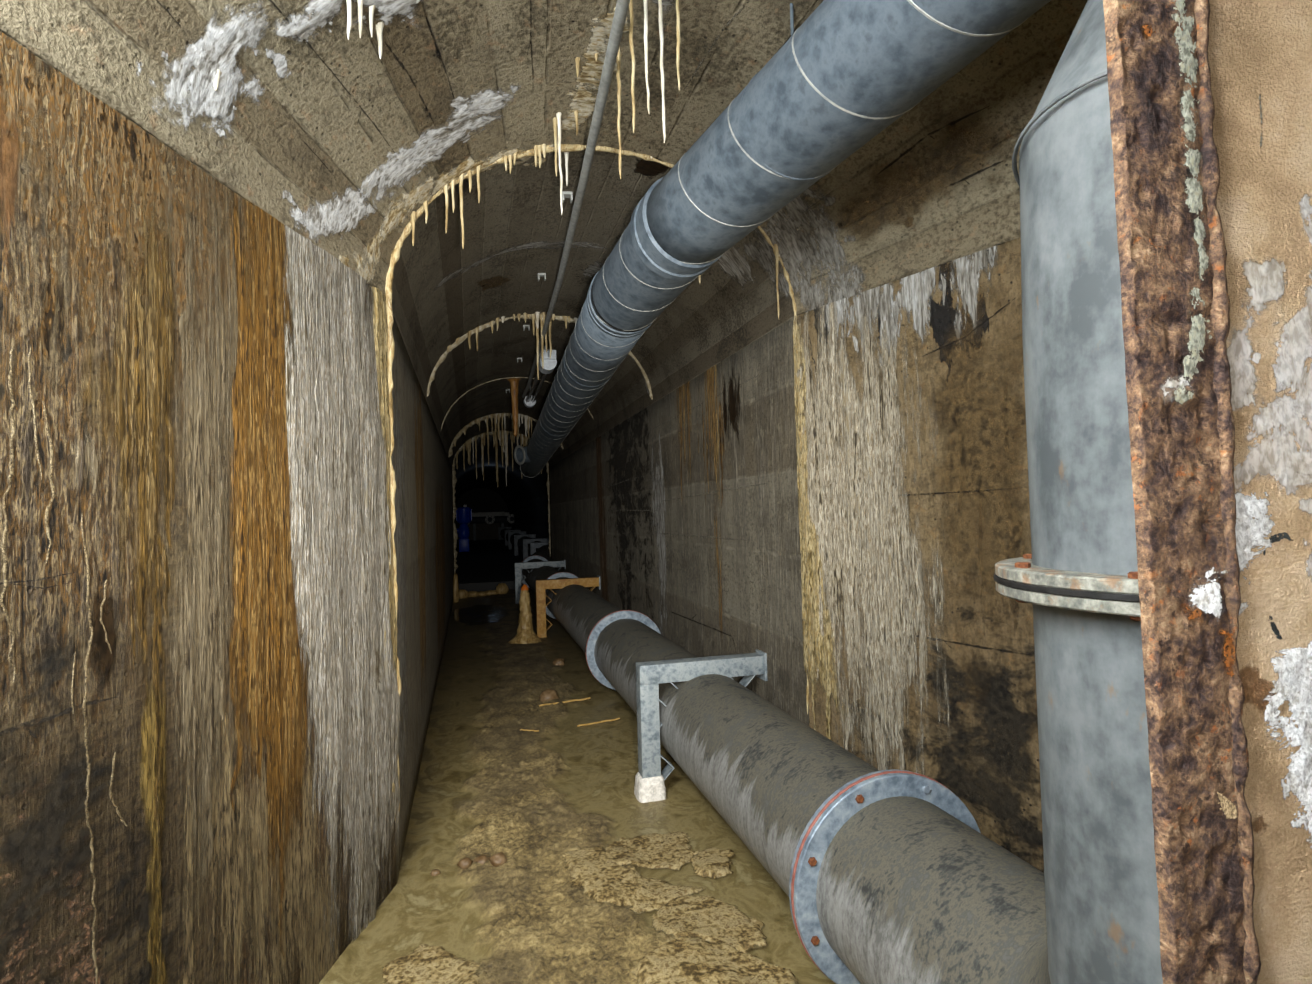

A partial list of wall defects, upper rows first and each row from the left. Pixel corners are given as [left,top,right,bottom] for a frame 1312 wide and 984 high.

efflorescence [152,0,420,136]
leakage [561,11,629,133]
leakage [634,157,668,180]
leakage [628,351,653,400]
leakage [1162,377,1189,393]
leakage [0,348,56,684]
crack [0,572,76,589]
leakage [168,86,575,984]
leakage [717,189,997,771]
rust [1184,605,1202,621]
crack [0,696,117,738]
leakage [71,513,116,984]